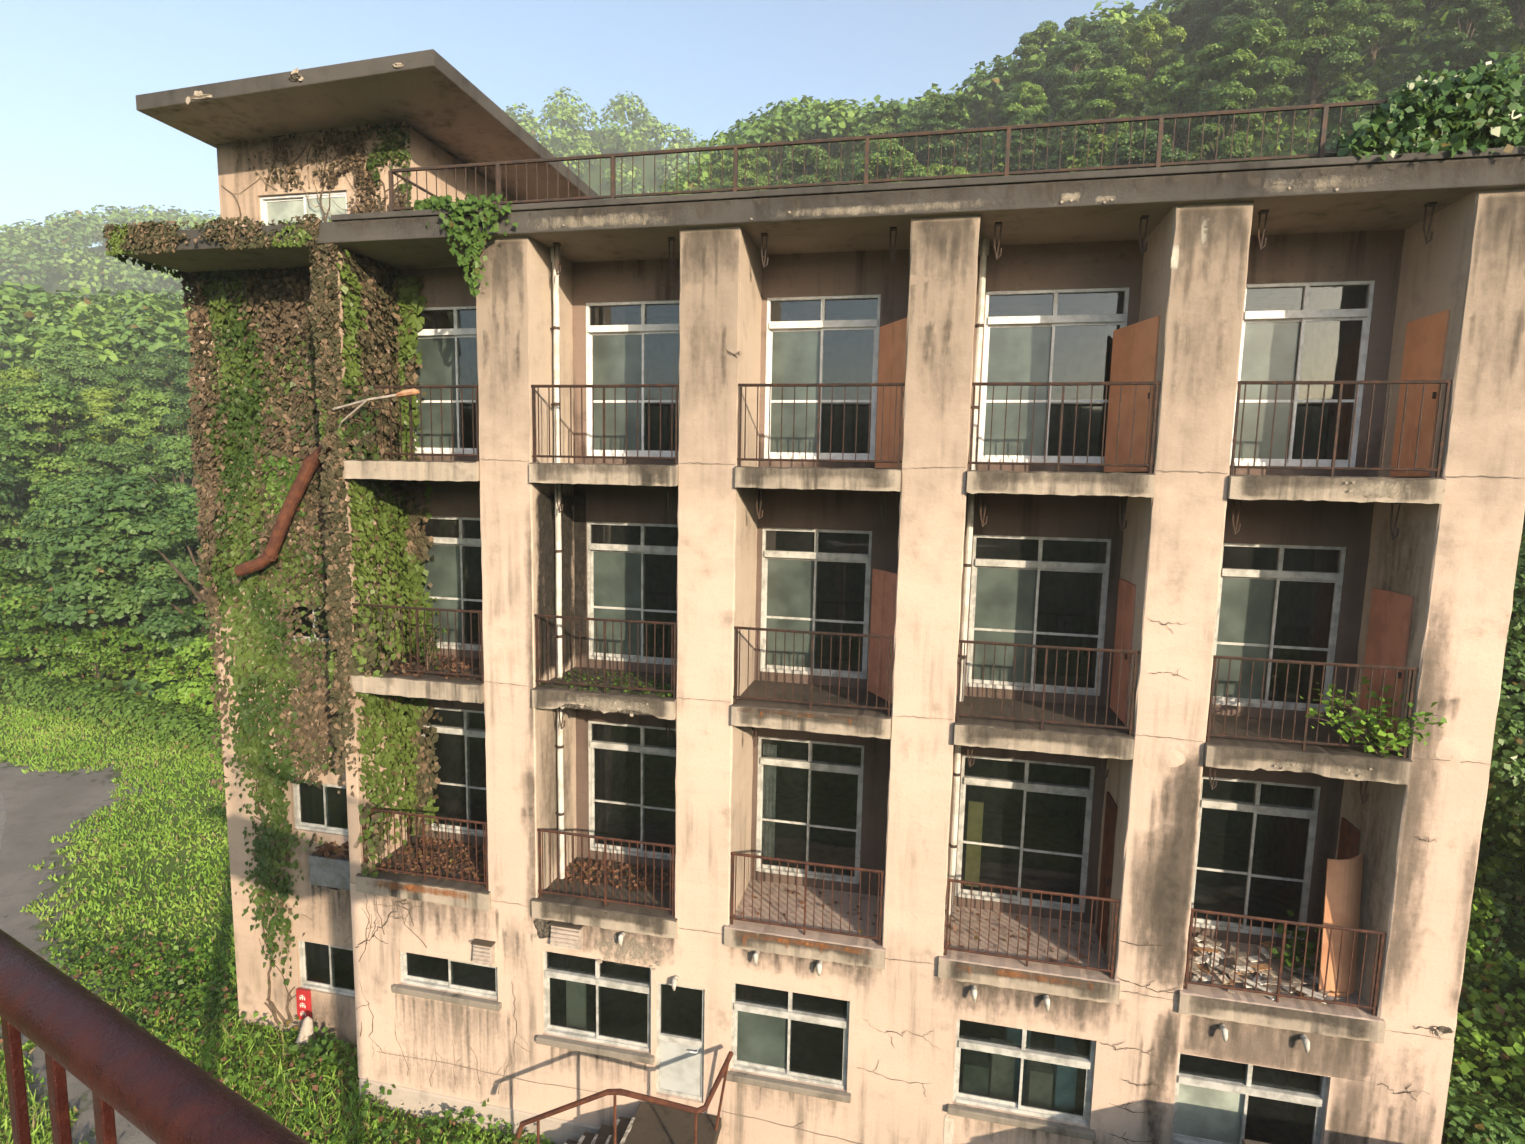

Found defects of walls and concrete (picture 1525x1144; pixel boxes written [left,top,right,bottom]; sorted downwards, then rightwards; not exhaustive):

corrosion [379,882,466,900]
water stain [1138,758,1199,986]
water stain [1219,634,1456,987]
crack [862,1020,935,1098]
crack [1100,1042,1158,1144]
water stain [1146,996,1370,1144]